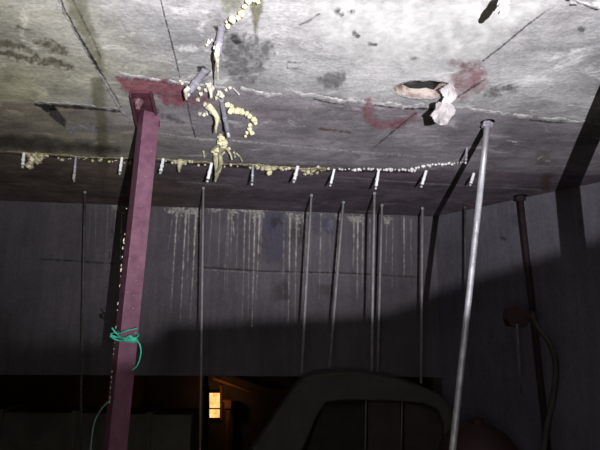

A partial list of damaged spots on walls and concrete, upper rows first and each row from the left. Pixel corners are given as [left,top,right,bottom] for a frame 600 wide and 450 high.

damp [251,0,262,28]
crack [58,0,126,116]
crack [162,101,214,141]
spalling [392,79,461,125]
damp [168,208,199,270]
damp [235,209,279,261]
damp [269,214,304,267]